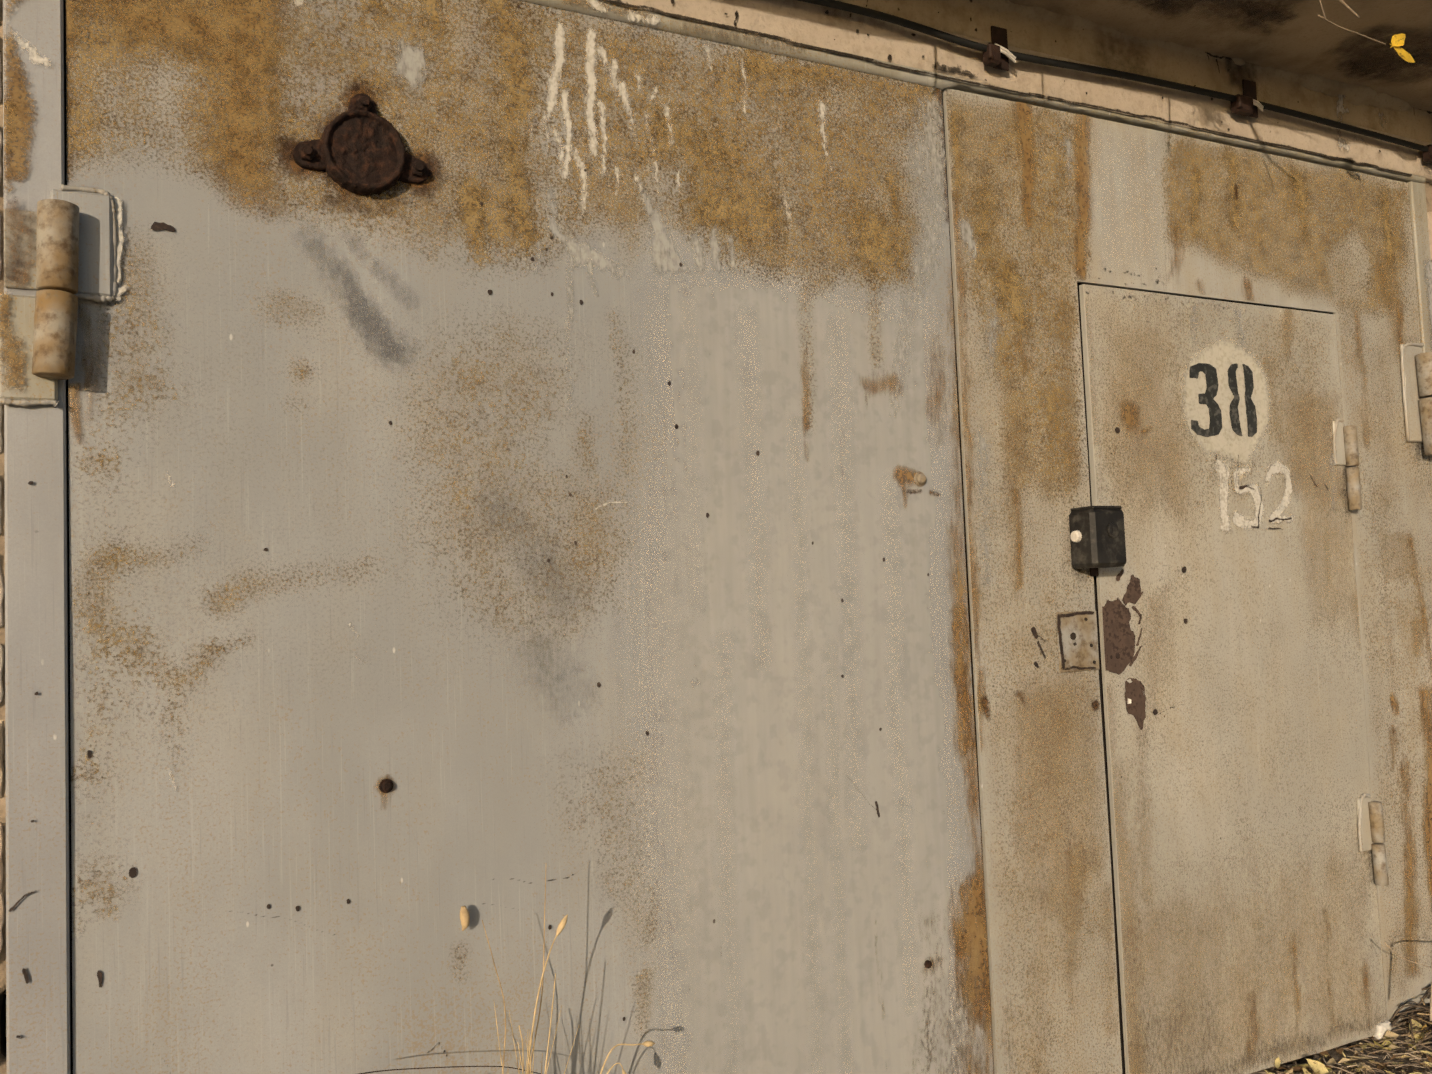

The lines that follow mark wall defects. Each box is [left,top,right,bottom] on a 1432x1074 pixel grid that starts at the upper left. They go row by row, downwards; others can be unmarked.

leakage [1129,0,1301,33]
rust [4,33,38,192]
rust [0,294,26,390]
rust [1098,302,1331,504]
rust [66,0,1114,1074]
rust [1162,135,1432,986]
peeling [1057,569,1172,730]